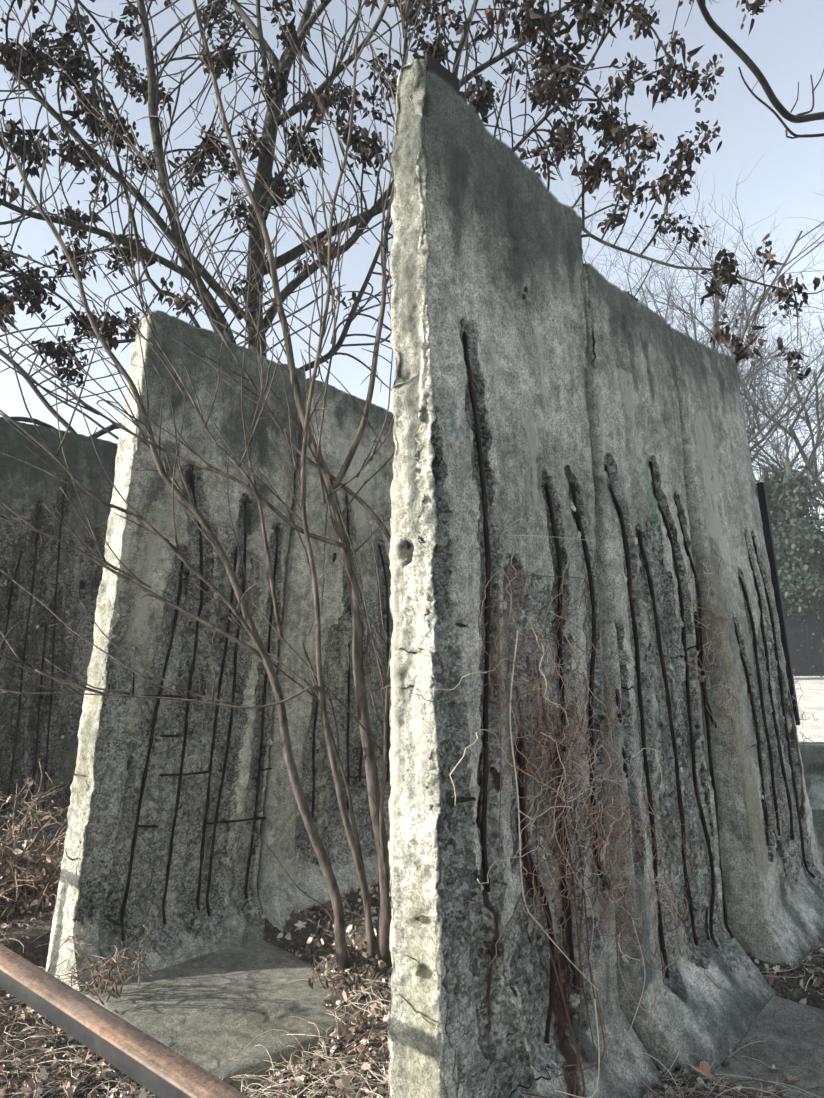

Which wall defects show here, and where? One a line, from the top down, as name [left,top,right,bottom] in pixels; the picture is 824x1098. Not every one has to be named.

spalling [0,473,105,834]
spalling [72,460,284,977]
corrosion [476,697,503,842]
spalling [294,317,748,1098]
corrosion [514,734,536,902]
corrosion [788,690,805,819]
corrosion [482,884,504,1045]